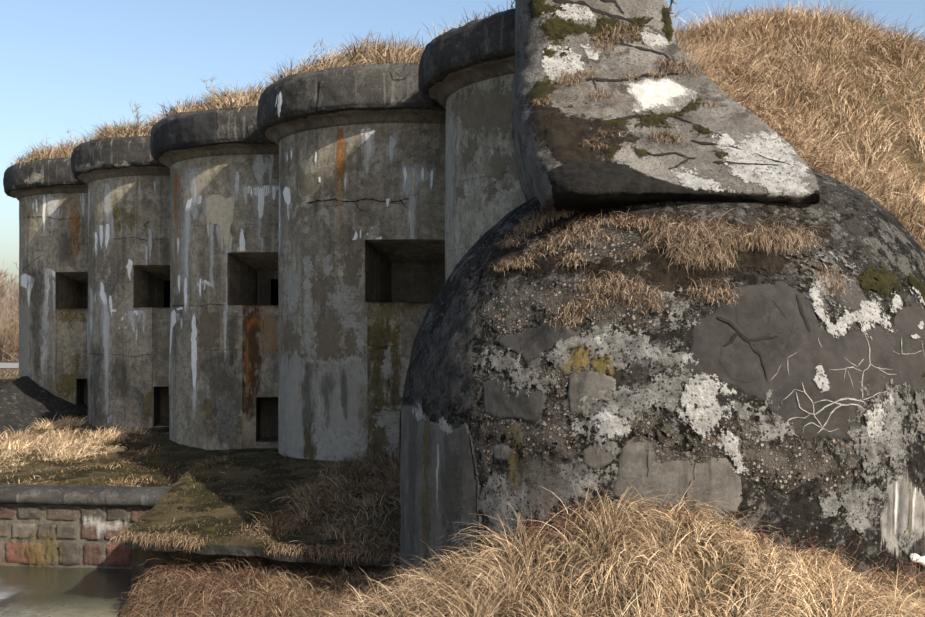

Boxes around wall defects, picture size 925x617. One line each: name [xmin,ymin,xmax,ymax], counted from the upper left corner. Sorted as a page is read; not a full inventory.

crack [553,0,654,24]
crack [577,42,679,89]
rust [336,128,347,229]
crack [307,197,418,211]
crack [613,102,785,169]
leakage [19,268,56,381]
leakage [169,155,291,412]
rust [242,306,277,418]
crack [717,294,924,437]